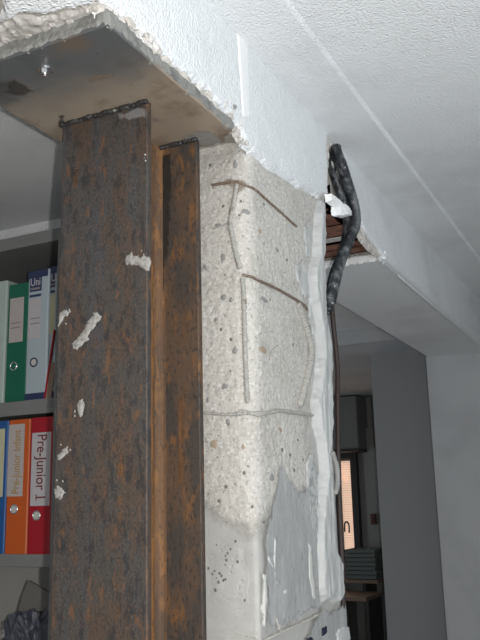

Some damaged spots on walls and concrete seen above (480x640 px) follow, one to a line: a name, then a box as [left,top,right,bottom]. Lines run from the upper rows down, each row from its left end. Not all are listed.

spalling [0,0,351,640]
spalling [345,227,386,266]